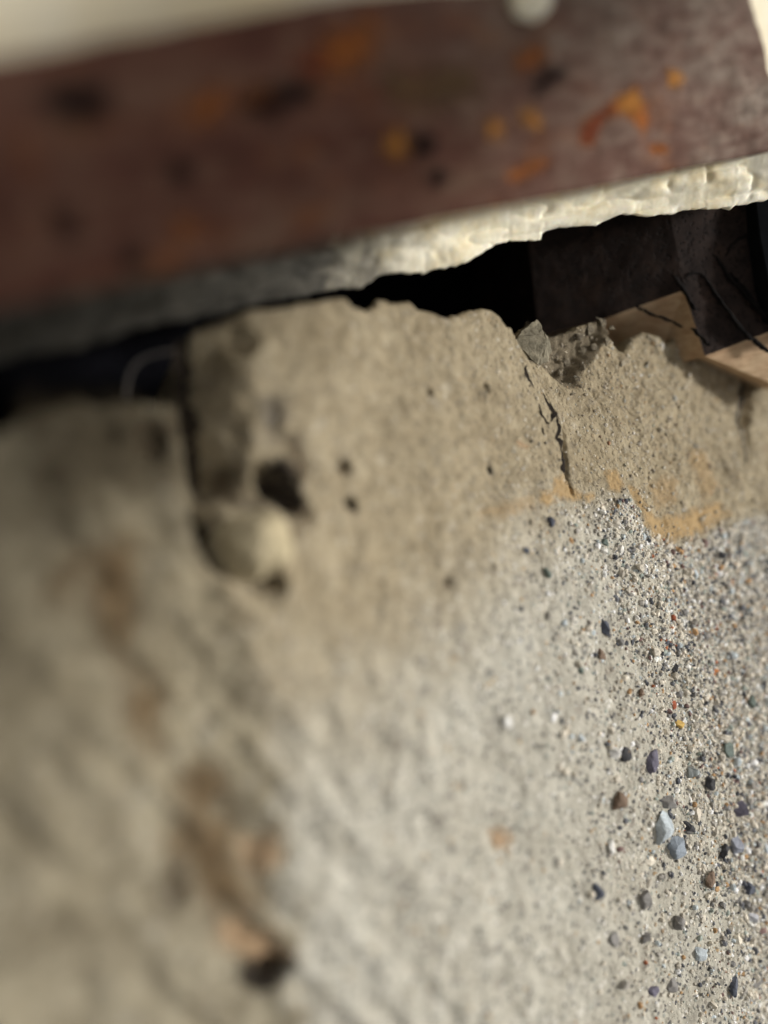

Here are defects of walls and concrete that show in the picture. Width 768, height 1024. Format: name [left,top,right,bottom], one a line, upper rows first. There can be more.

rust [43,84,108,124]
rust [581,87,650,145]
spalling [528,317,615,396]
crack [524,365,577,502]